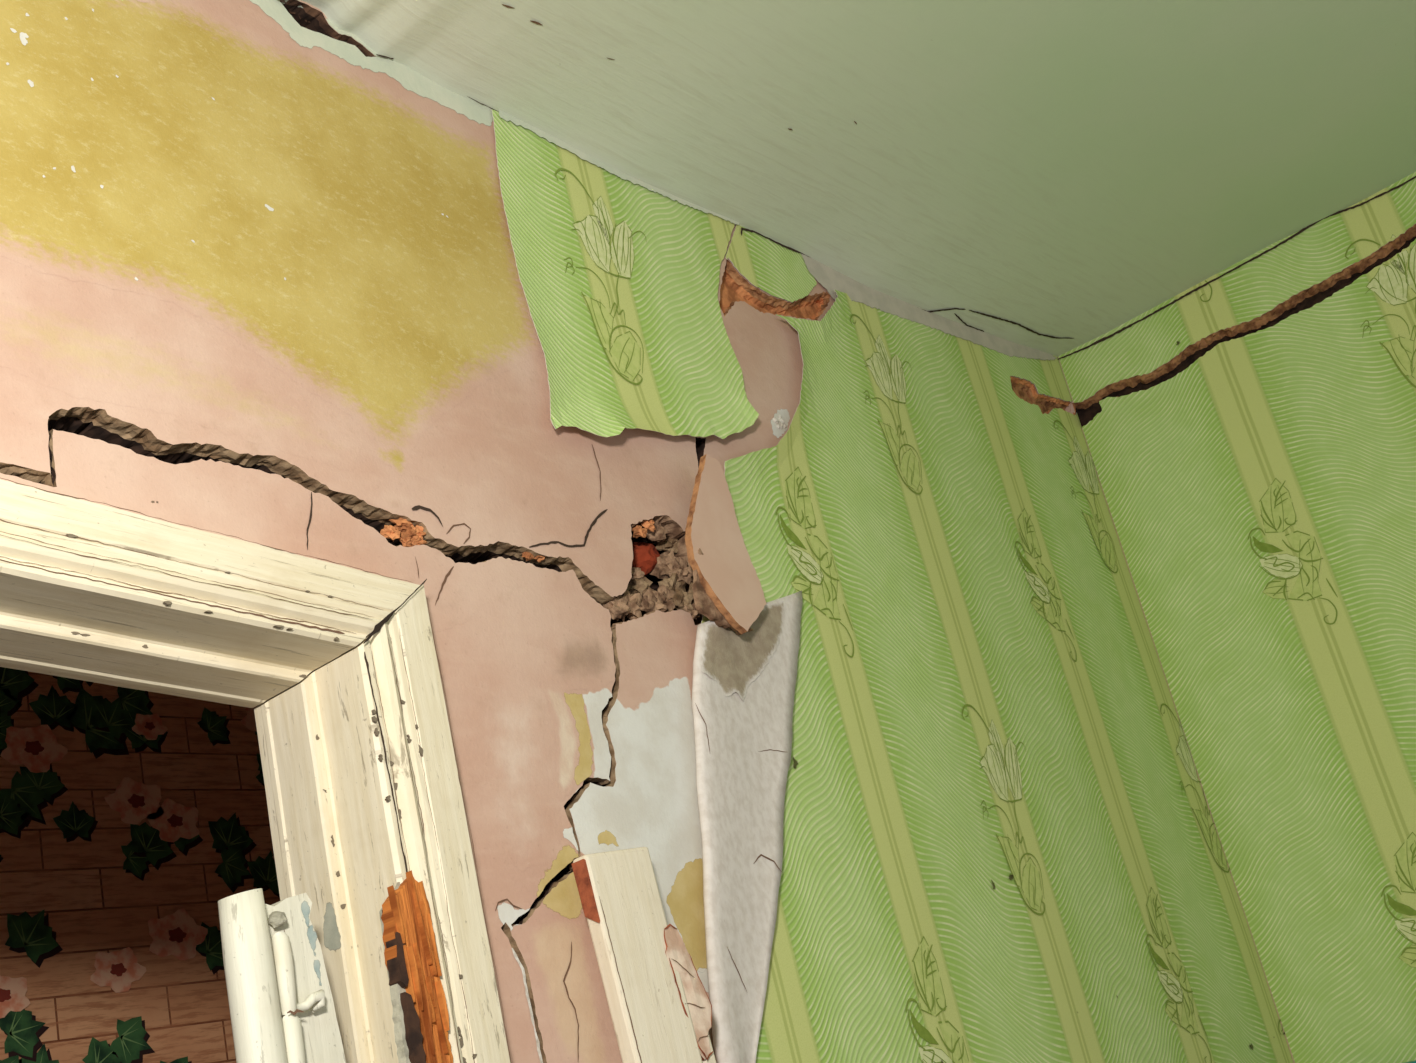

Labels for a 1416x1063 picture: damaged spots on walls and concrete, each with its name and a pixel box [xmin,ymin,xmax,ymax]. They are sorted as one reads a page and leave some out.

crack [922,176,1416,360]
crack [1010,224,1416,427]
crack [695,437,706,469]
flaking render [771,409,790,438]
peeling [603,454,767,635]
crack [0,407,655,1063]
leakage [700,600,785,701]
peeling [497,675,709,1063]
crack [671,958,709,1041]